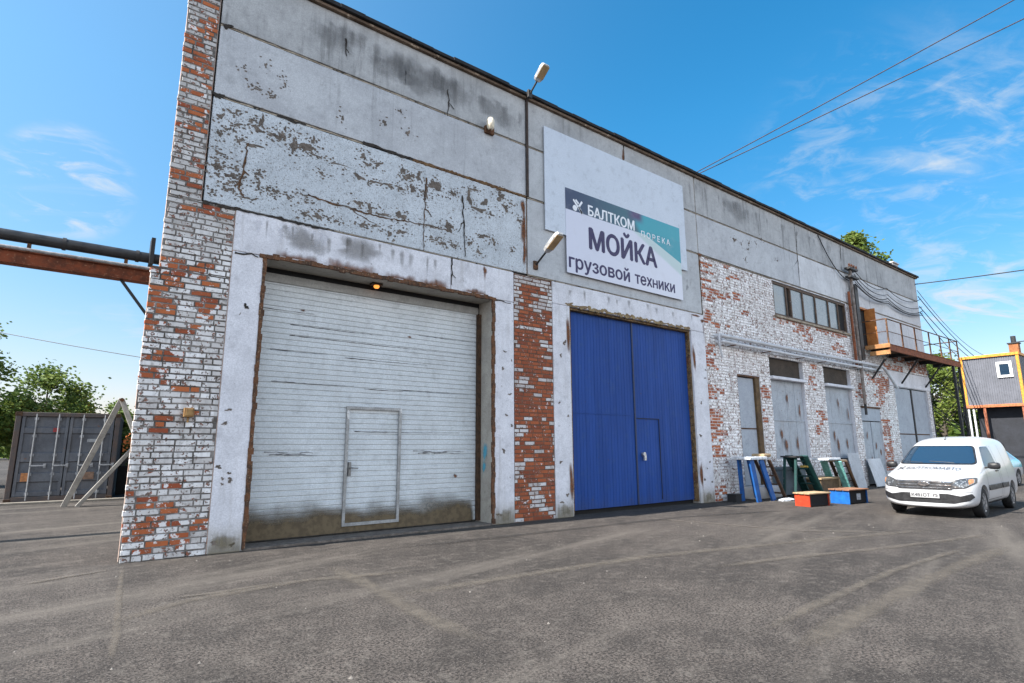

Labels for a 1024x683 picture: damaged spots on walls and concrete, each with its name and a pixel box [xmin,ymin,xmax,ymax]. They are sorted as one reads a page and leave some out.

peeling [169,0,524,258]
crack [234,143,250,198]
crack [308,178,466,285]
flaking render [144,256,221,334]
flaking render [700,261,749,328]
flaking render [149,416,173,433]
flaking render [138,350,199,392]
flaking render [502,279,569,521]
flaking render [699,343,728,502]
flaking render [855,356,927,406]
flaking render [121,483,235,555]
leakage [245,498,472,542]